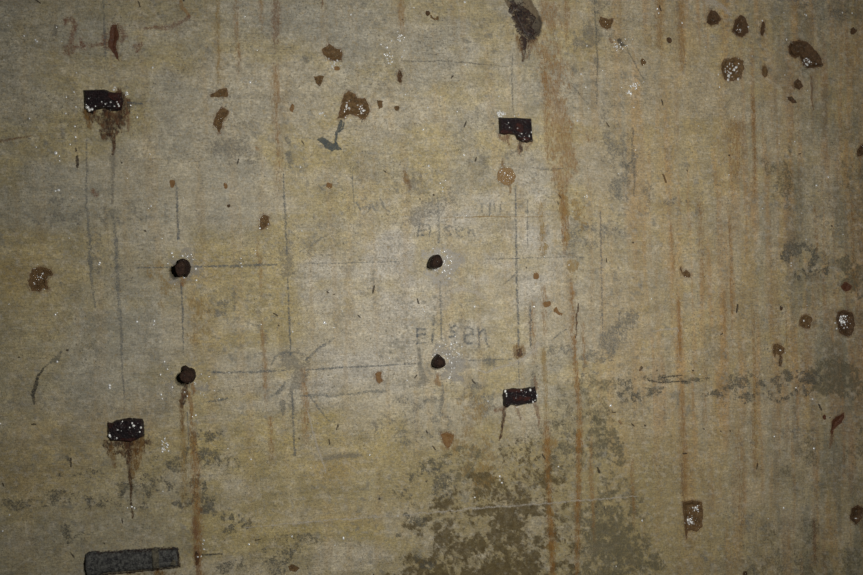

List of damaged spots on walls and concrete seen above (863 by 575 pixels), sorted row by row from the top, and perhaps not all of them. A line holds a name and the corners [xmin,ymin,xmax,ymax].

corrosion [84,89,132,163]
corrosion [499,123,530,153]
corrosion [508,0,587,244]
corrosion [497,161,516,195]
corrosion [495,353,546,439]
damp [600,376,668,402]
damp [705,354,863,404]
corrosion [102,437,150,518]
corrosion [179,384,202,573]
damp [396,407,665,575]
corrosion [95,546,181,575]